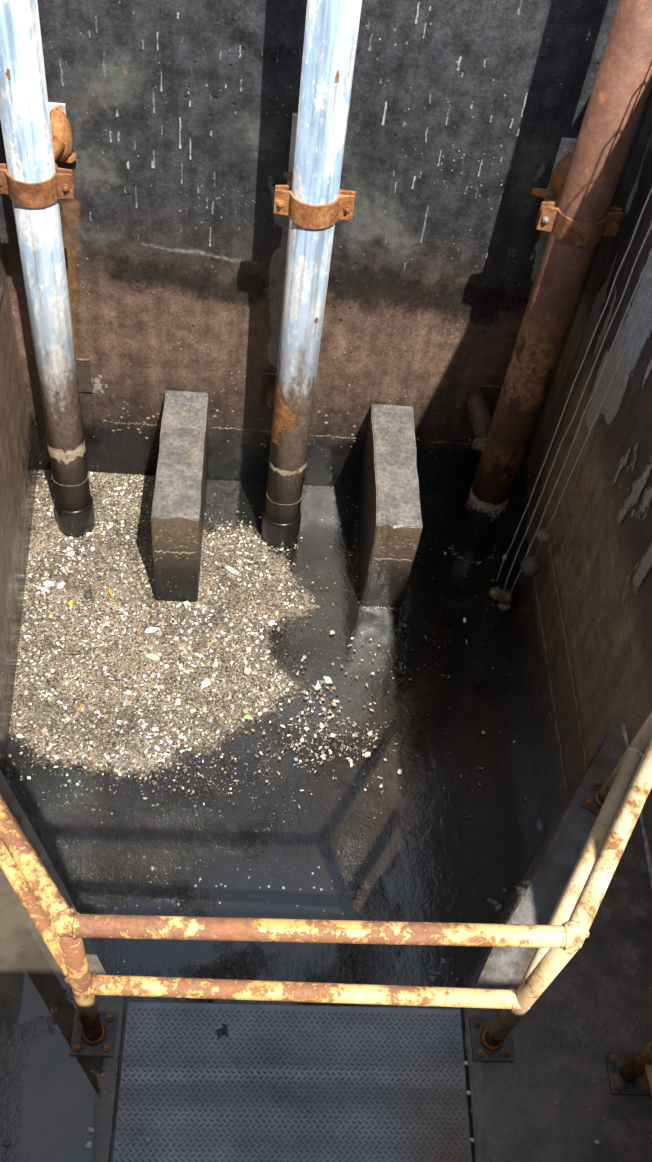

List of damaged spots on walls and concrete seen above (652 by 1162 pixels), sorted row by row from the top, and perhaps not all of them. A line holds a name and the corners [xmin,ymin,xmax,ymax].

leakage [112,256,271,304]
leakage [328,183,522,323]
peeling [582,249,652,433]
leakage [91,375,108,394]
peeling [613,444,652,526]